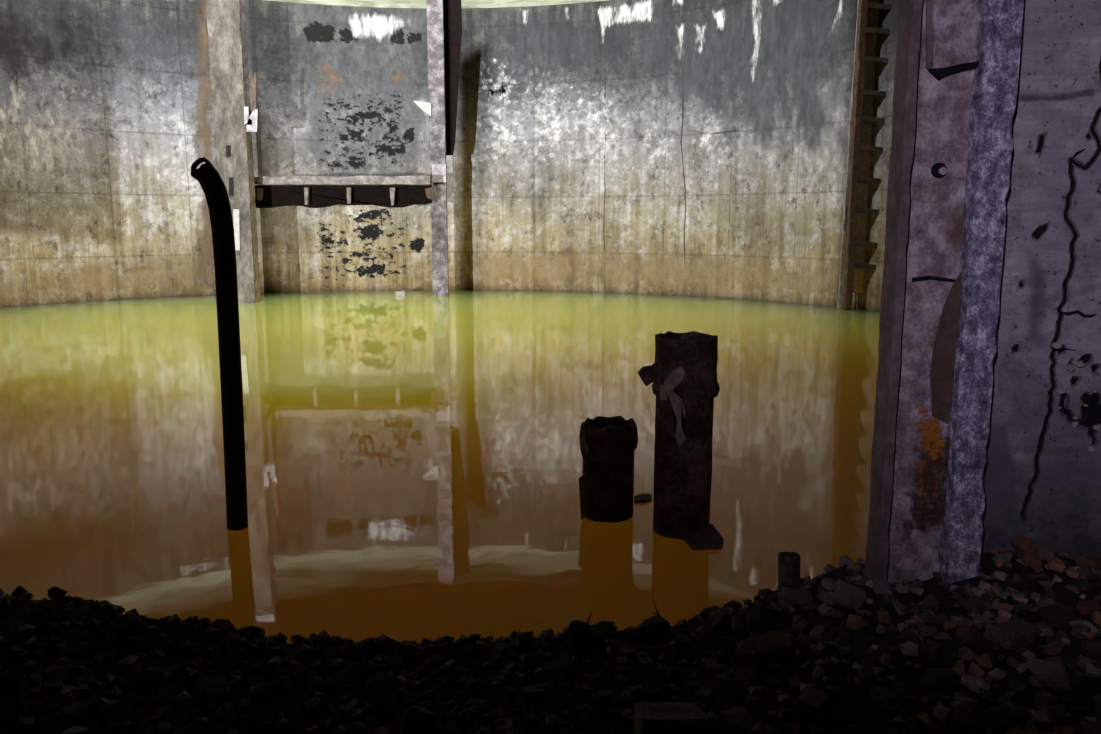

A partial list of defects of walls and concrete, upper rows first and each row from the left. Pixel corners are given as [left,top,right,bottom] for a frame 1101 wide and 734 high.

spalling [318,91,415,170]
damp [660,0,842,144]
spalling [315,208,425,285]
crack [1022,108,1101,520]
spalling [1051,342,1101,452]
corrosion [903,405,950,535]